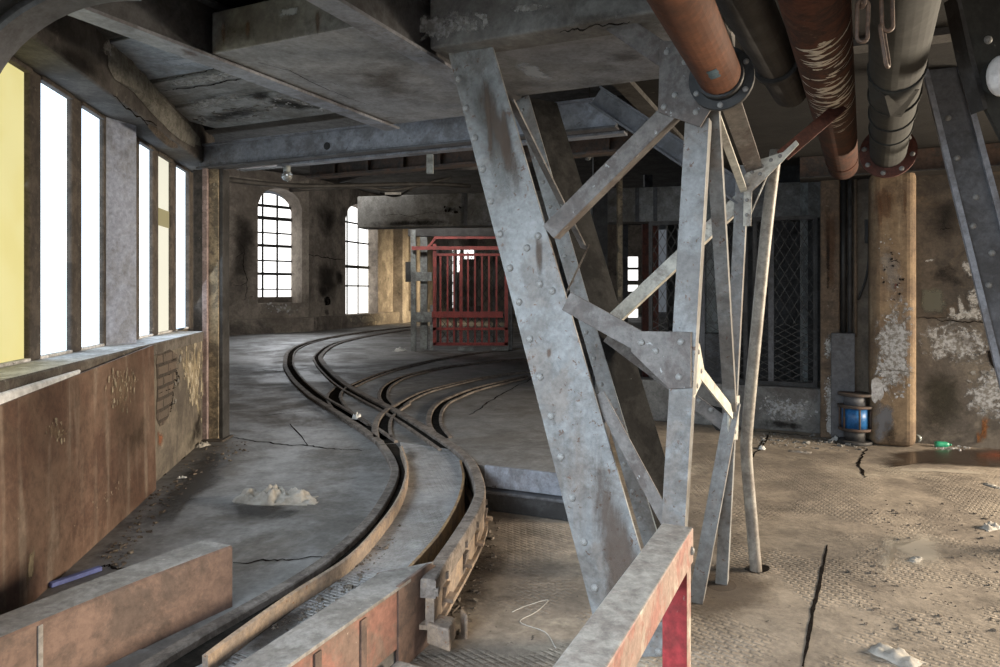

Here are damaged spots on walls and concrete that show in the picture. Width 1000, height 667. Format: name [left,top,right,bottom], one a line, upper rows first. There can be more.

crack [164,68,239,91]
peeling [871,234,1000,423]
spalling [156,341,203,426]
crack [234,410,361,451]
crack [856,448,868,477]
leakage [888,449,1000,474]
crack [233,556,322,564]